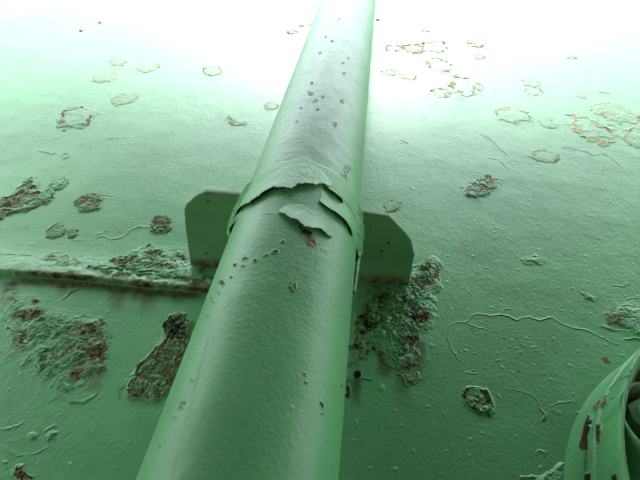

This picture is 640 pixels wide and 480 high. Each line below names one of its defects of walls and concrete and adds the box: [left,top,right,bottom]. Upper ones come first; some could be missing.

spalling [0,176,56,220]
spalling [73,193,114,214]
crack [49,221,151,242]
spalling [148,215,174,234]
peeling [233,156,356,237]
spalling [460,175,503,198]
spalling [85,243,212,285]
hole [232,240,286,268]
spalling [117,311,195,404]
spalling [347,255,444,388]
crack [446,308,620,375]
spalling [461,385,496,417]